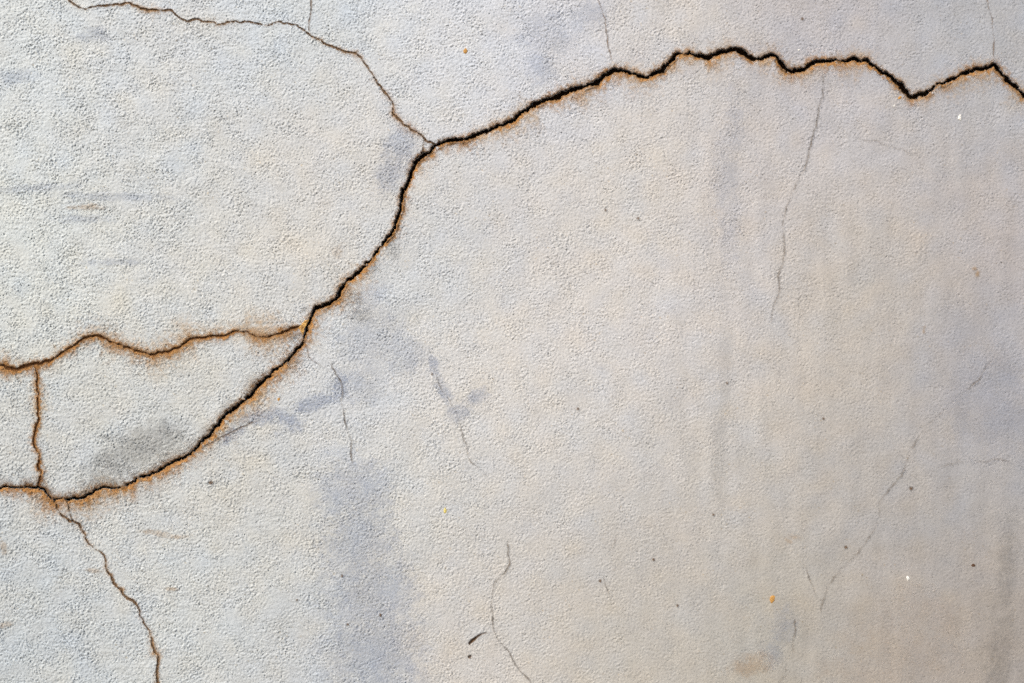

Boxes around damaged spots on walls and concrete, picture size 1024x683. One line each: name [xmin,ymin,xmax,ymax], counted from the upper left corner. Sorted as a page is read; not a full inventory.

rust [0,48,1024,506]
crack [68,0,1024,486]
crack [0,331,256,683]